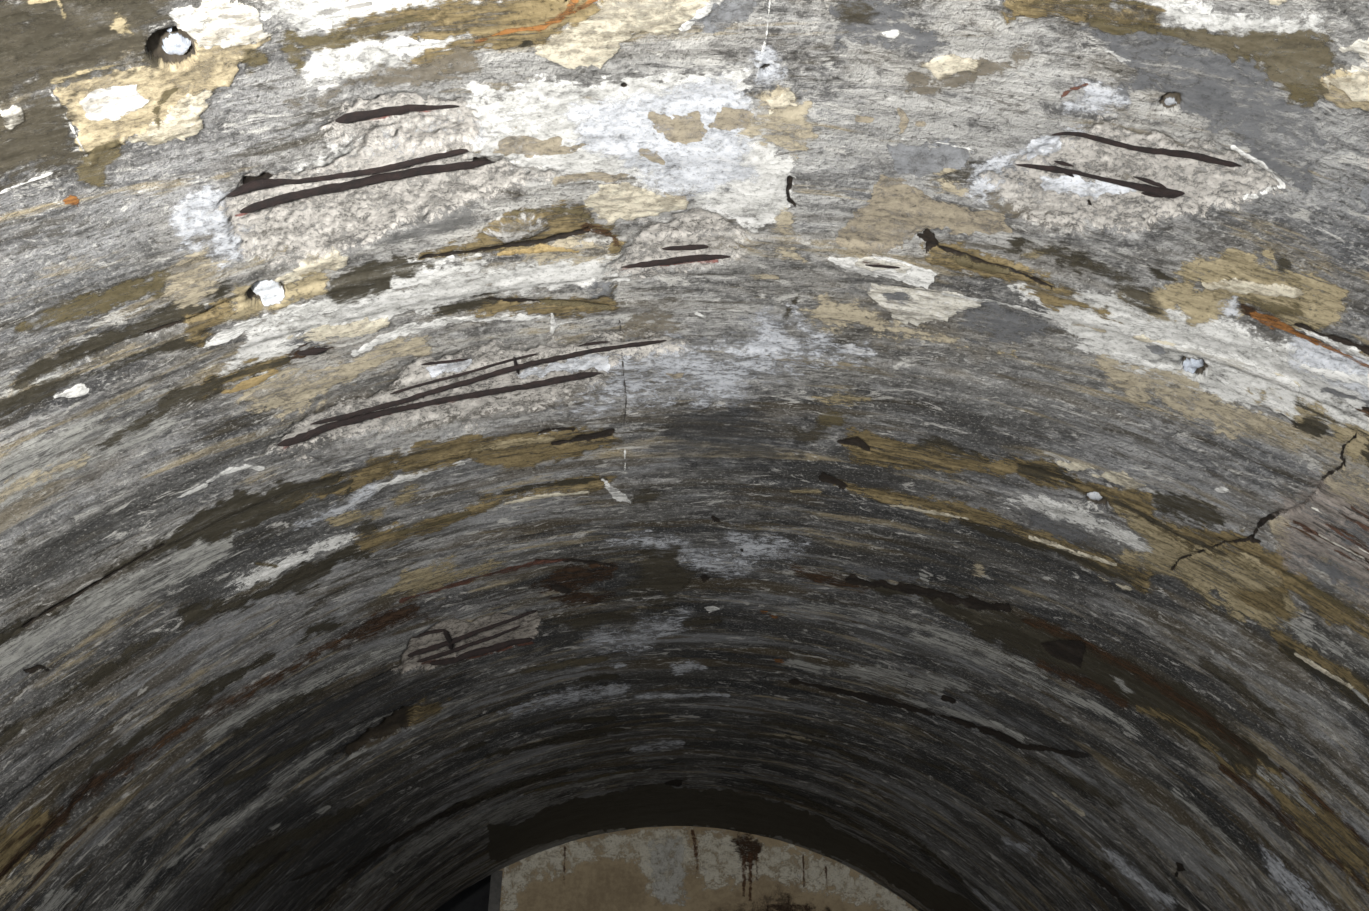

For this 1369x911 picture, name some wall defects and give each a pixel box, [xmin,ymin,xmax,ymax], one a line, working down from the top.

peeling [49,0,818,501]
peeling [783,0,1369,440]
crack [1171,407,1369,570]
crack [1294,323,1369,356]
corrosion [0,558,619,911]